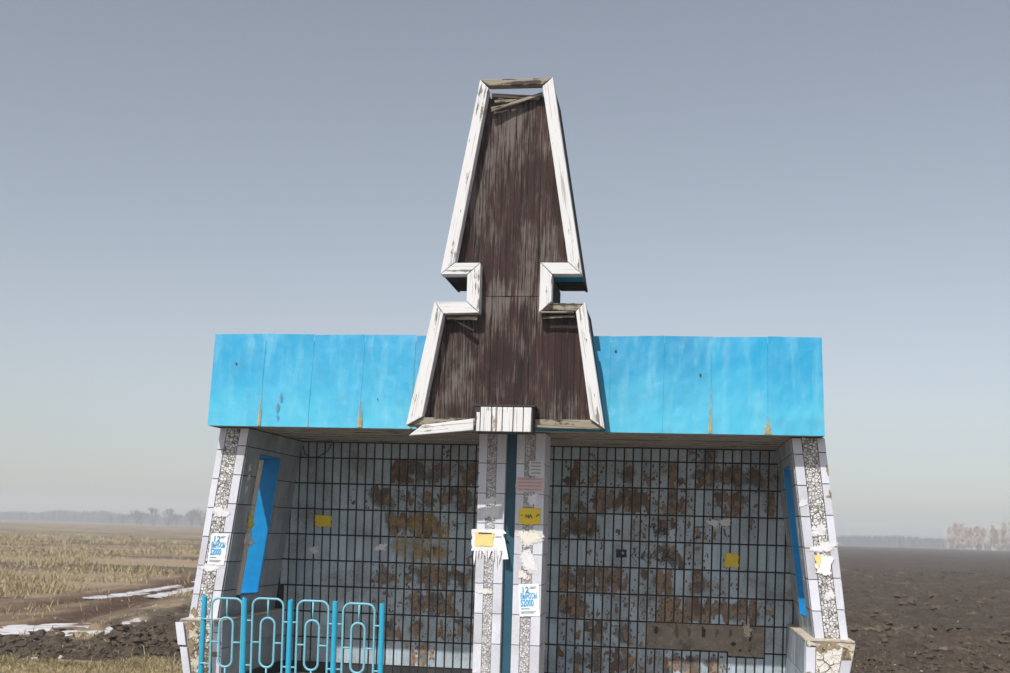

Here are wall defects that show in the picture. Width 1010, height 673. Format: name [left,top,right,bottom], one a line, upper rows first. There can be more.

peeling [350,445,479,667]
peeling [557,450,777,673]
spalling [807,640,854,660]